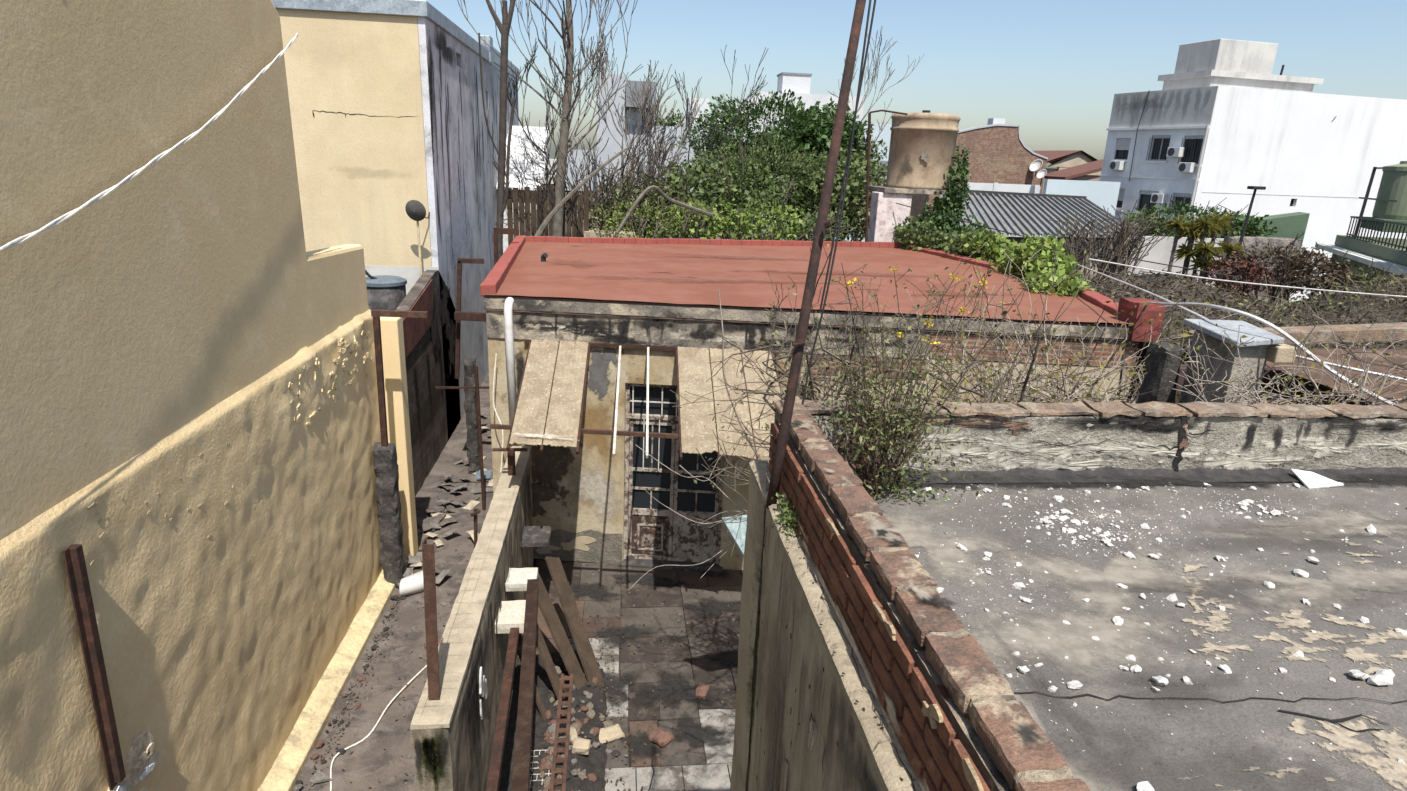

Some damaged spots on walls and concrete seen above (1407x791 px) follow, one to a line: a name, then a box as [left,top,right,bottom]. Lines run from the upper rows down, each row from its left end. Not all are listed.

crack [312,110,419,118]
leakage [428,31,509,235]
leakage [580,408,610,454]
crack [951,416,1218,472]
leakage [1061,415,1211,433]
leakage [1243,425,1257,450]
leakage [1275,416,1407,449]
crack [1291,428,1403,469]
peeling [1179,564,1407,676]
flaking render [107,731,160,791]
peeling [1243,767,1301,779]
peeling [1288,711,1407,791]